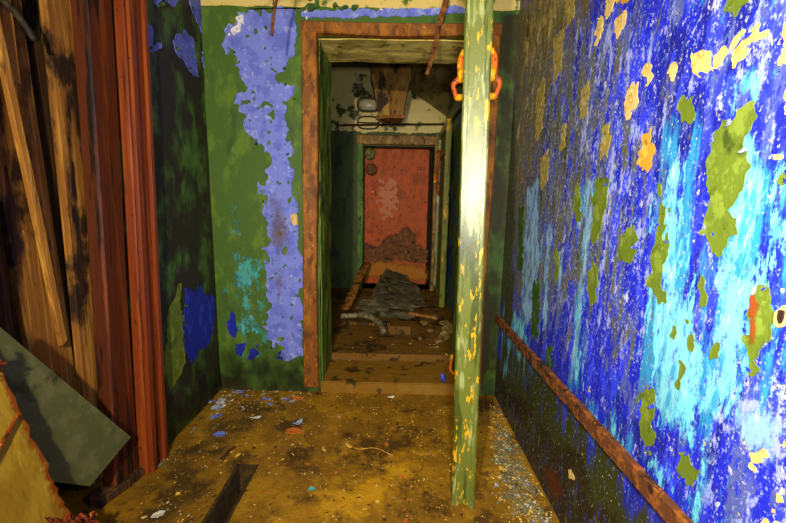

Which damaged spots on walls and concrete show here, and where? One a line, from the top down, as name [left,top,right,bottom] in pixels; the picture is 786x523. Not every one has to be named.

peeling [594,0,629,46]
peeling [690,23,770,82]
peeling [624,62,653,120]
peeling [674,95,696,124]
peeling [222,0,465,361]
peeling [636,127,656,173]
peeling [699,100,757,257]
peeling [618,225,639,264]
peeling [646,183,671,305]
peeling [741,284,775,377]
peeling [636,385,656,456]
peeling [676,451,701,487]